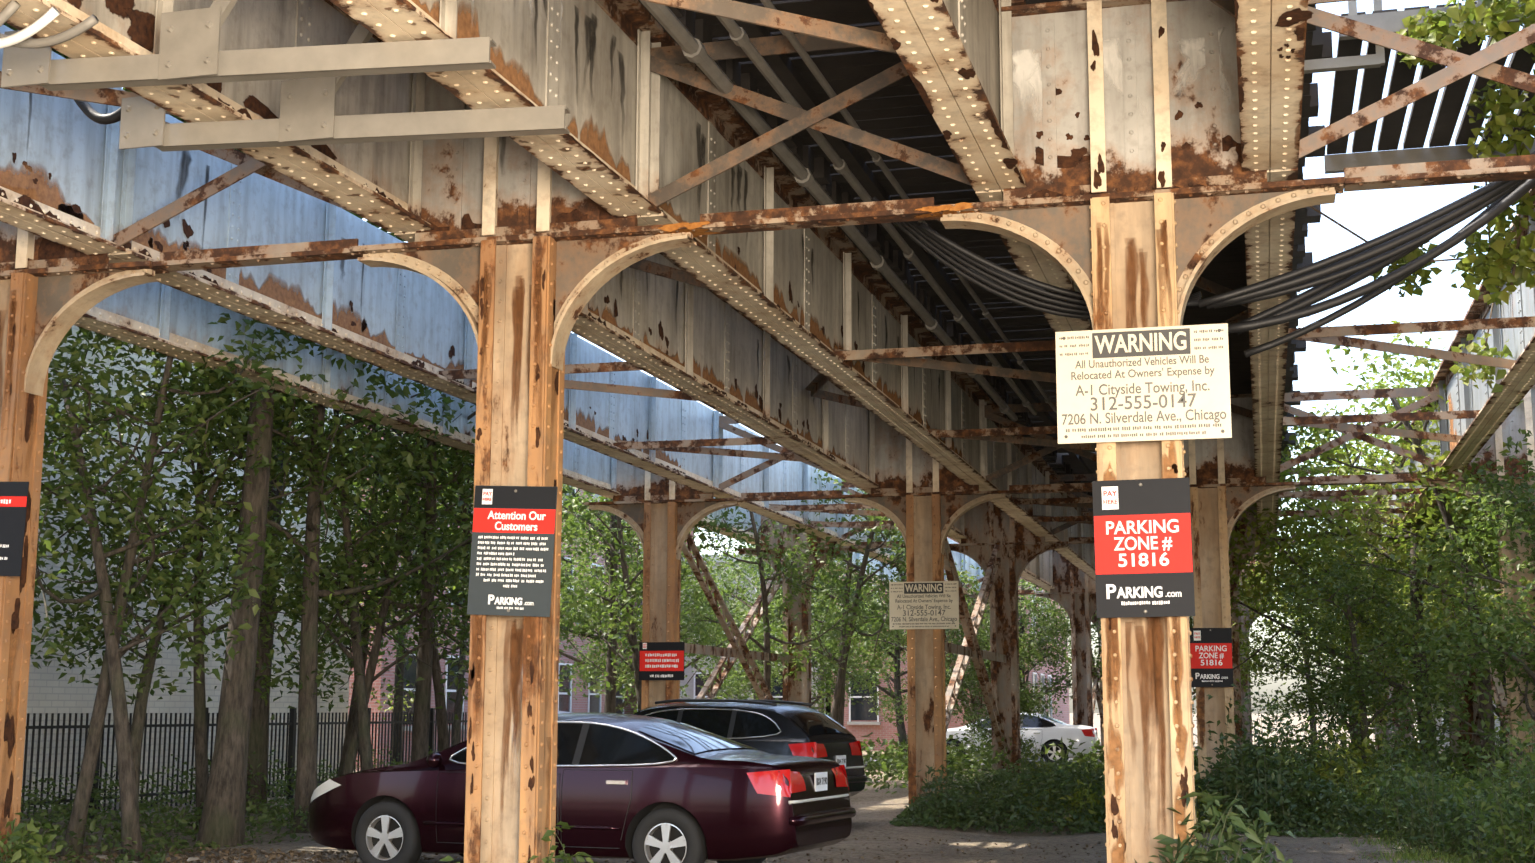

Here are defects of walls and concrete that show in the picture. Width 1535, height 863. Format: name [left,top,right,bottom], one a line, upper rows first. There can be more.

peeling [0,153,83,229]
rust [411,0,543,106]
peeling [957,68,976,79]
peeling [986,109,1025,184]
peeling [1090,30,1100,71]
peeling [1093,153,1105,189]
peeling [1237,56,1245,163]
rust [1275,0,1313,150]
rust [203,268,477,383]
rust [513,266,556,393]
rust [1097,227,1170,328]
rust [1106,616,1187,765]